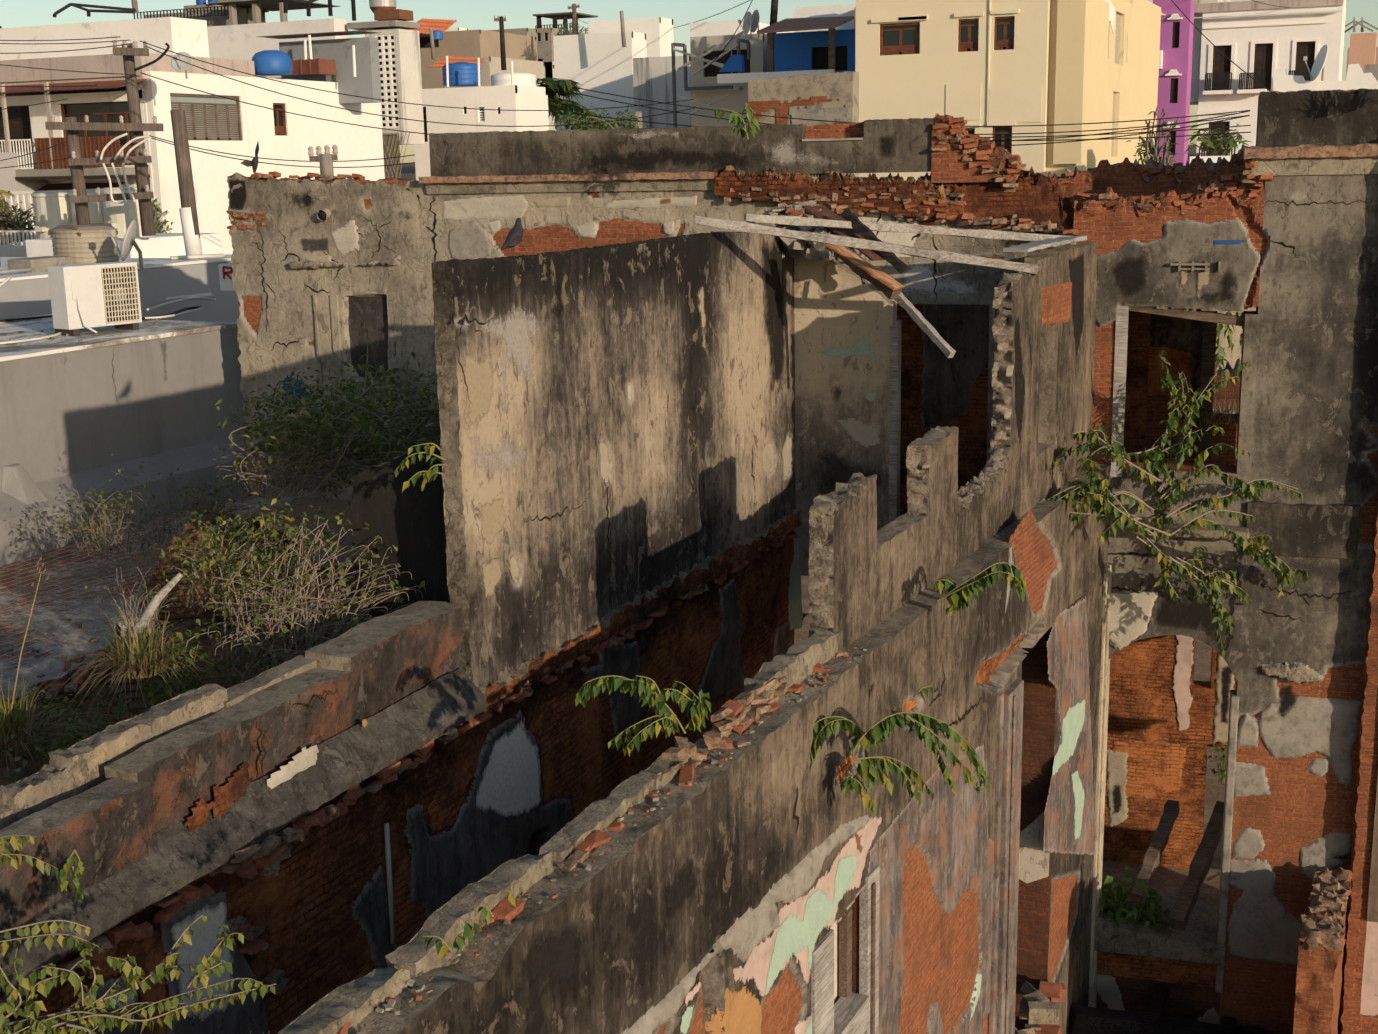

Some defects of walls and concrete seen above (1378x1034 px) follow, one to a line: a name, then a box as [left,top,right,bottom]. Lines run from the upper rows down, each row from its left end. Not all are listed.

crack [406,188,438,262]
spalling [493,218,685,257]
spalling [237,295,263,335]
crack [252,218,398,350]
leakage [555,286,563,318]
leakage [762,240,786,389]
leakage [482,309,538,411]
spalling [1277,664,1363,701]
spalling [185,745,319,832]
peeling [732,817,885,1034]
spalling [898,845,989,1034]
spalling [657,982,705,1034]